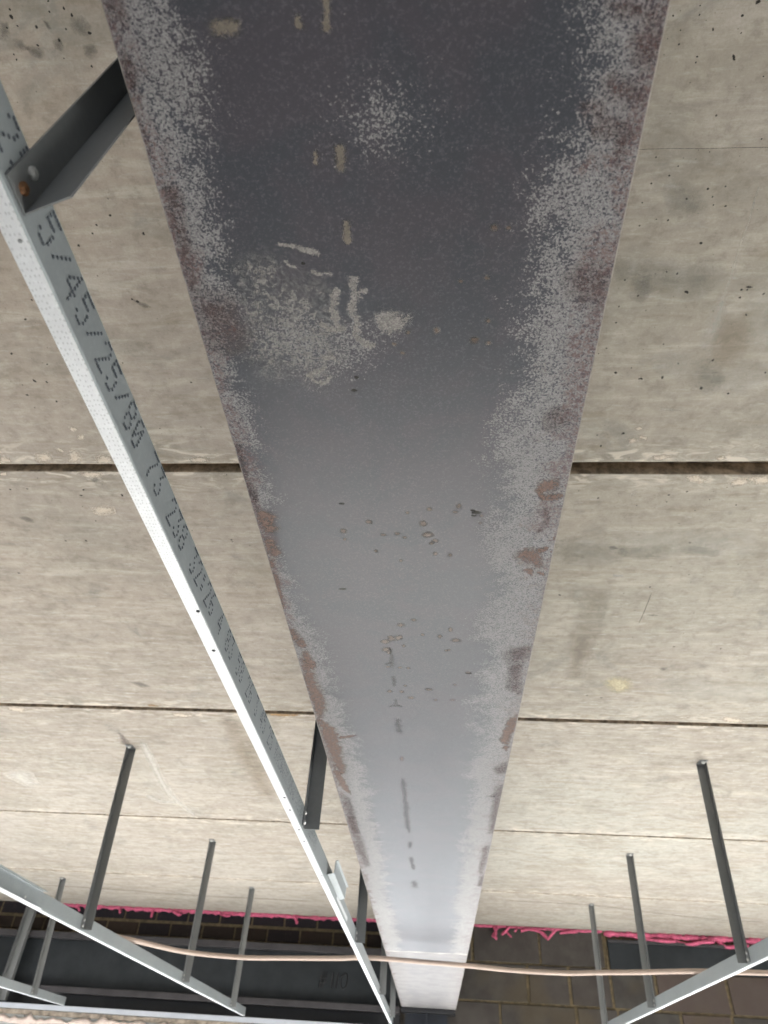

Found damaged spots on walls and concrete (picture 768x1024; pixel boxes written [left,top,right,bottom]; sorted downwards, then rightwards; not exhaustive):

corrosion [611,1,665,67]
corrosion [517,479,563,576]
corrosion [290,629,369,866]
corrosion [499,715,518,750]